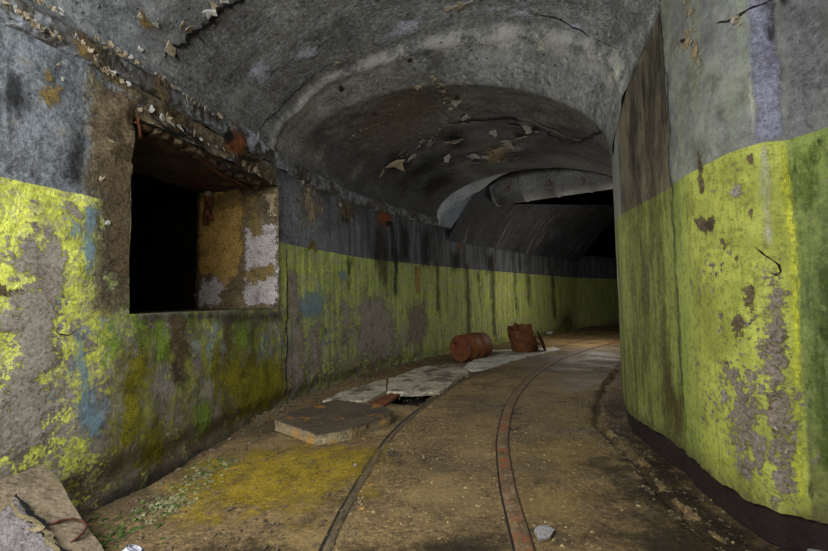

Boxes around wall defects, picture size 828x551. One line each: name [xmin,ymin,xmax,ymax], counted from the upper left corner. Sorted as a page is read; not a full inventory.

crack [164,0,245,60]
crack [716,0,786,29]
rust [223,123,261,163]
peeling [380,149,417,177]
peeling [419,129,464,162]
peeling [463,124,539,166]
peeling [0,0,280,470]
water stain [374,227,410,295]
water stain [451,251,496,335]
water stain [138,313,280,403]
peeling [715,267,802,506]